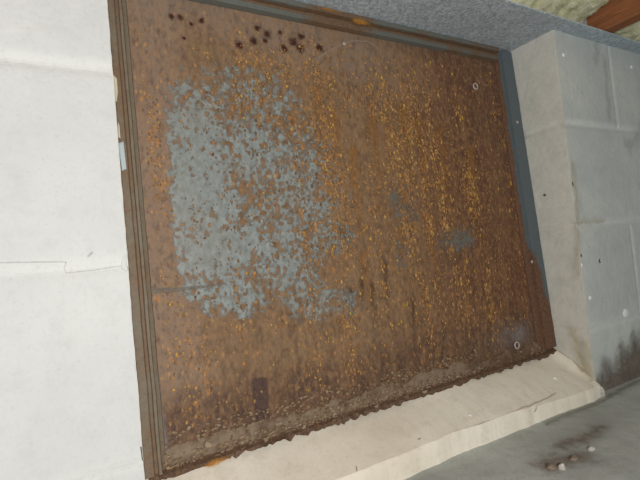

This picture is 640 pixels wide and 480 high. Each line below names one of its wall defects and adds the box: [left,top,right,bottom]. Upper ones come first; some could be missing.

peeling [164,66,362,323]
rust [142,26,547,470]
leakage [597,344,640,391]